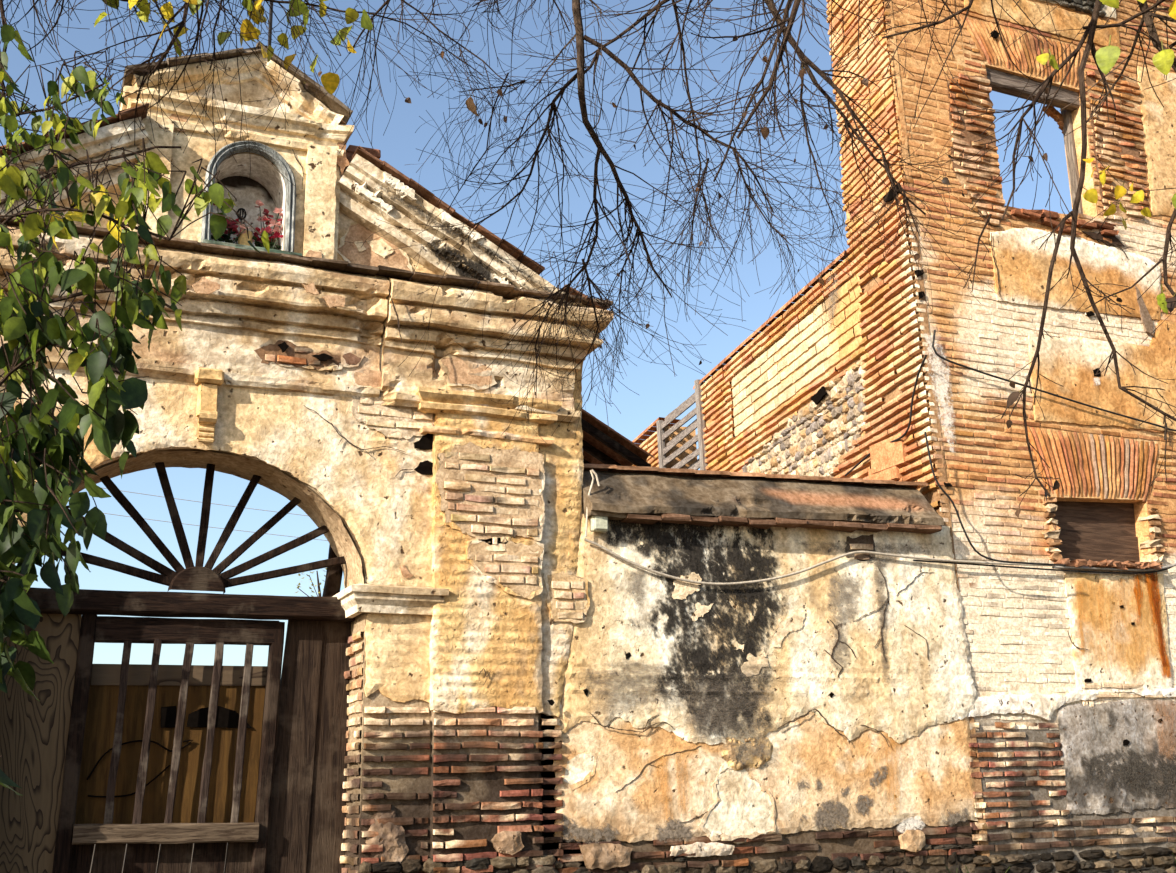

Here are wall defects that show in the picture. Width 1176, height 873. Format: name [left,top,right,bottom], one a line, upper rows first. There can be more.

spalling [253,340,435,440]
spalling [435,441,590,624]
damp [590,534,806,739]
crack [824,567,930,678]
corrosion [1133,572,1172,677]
crack [590,713,699,792]
crack [777,709,890,747]
damp [1081,748,1176,798]